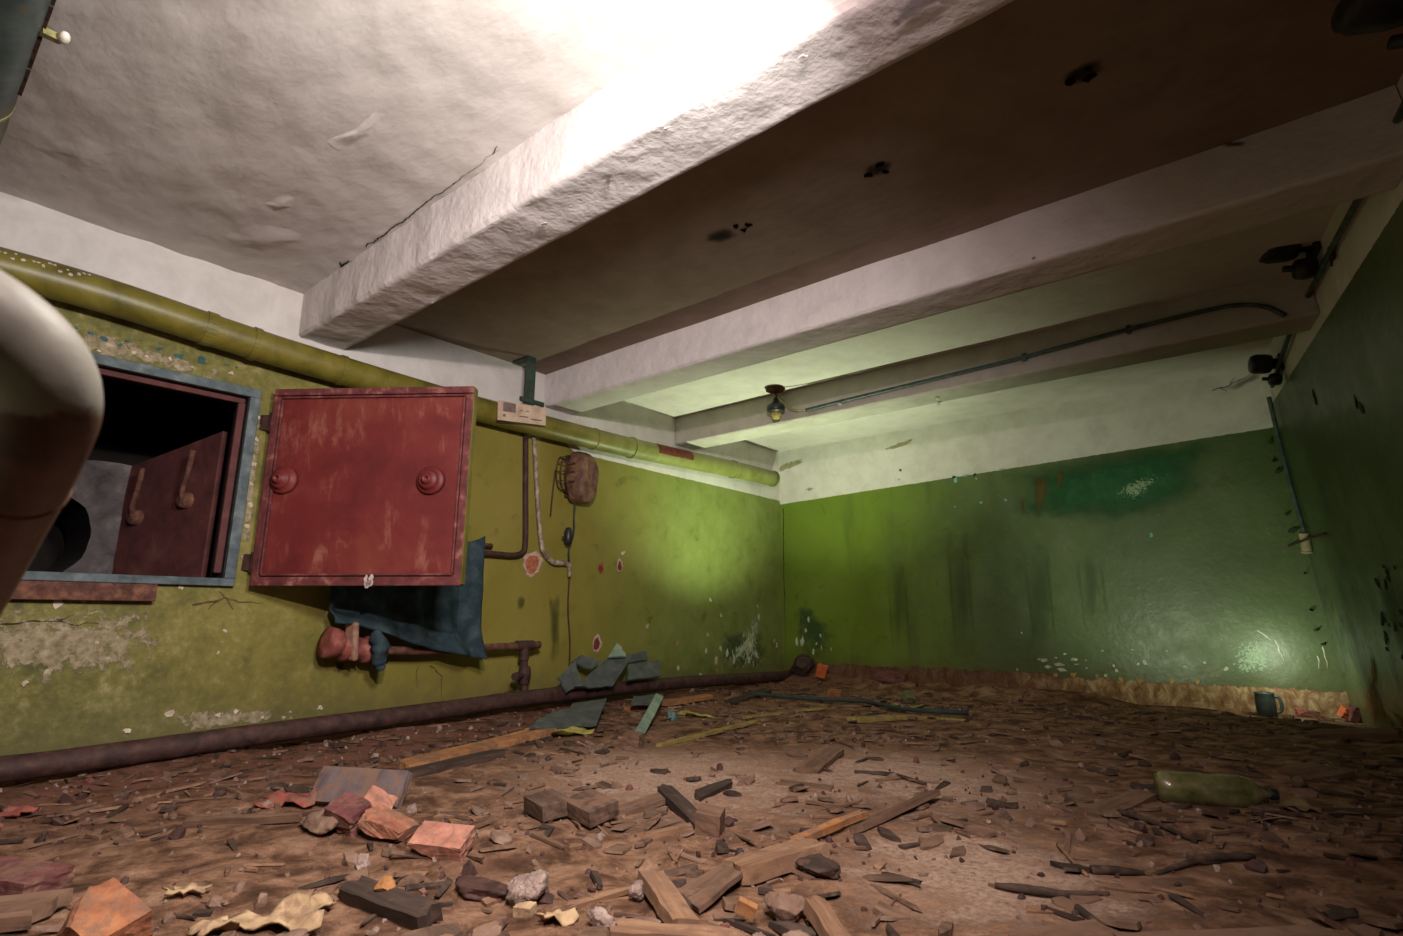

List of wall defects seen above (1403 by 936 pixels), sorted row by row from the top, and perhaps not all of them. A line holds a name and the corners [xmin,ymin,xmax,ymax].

peeling [0,600,164,687]
flaking render [809,649,1350,719]